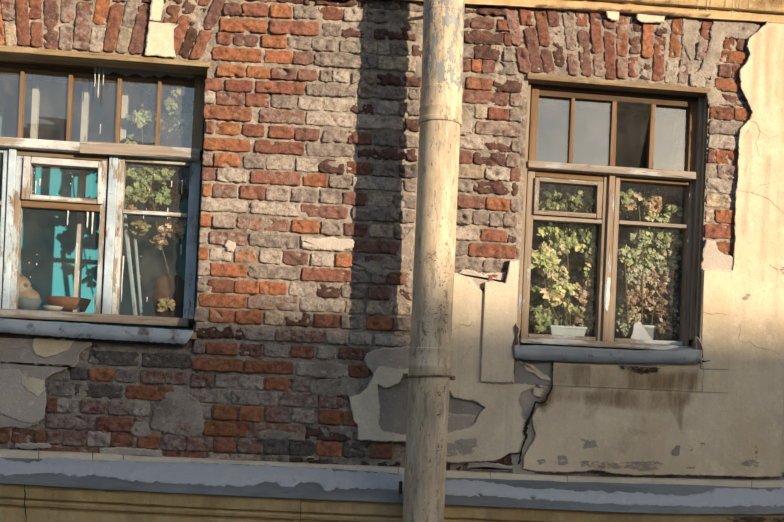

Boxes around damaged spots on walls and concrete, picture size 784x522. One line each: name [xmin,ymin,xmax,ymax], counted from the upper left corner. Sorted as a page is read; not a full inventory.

rust [536,0,710,17]
flaking render [454,4,762,305]
flaking render [0,0,423,470]
crack [492,363,554,464]
flaking render [446,358,784,484]
leakage [620,366,660,374]